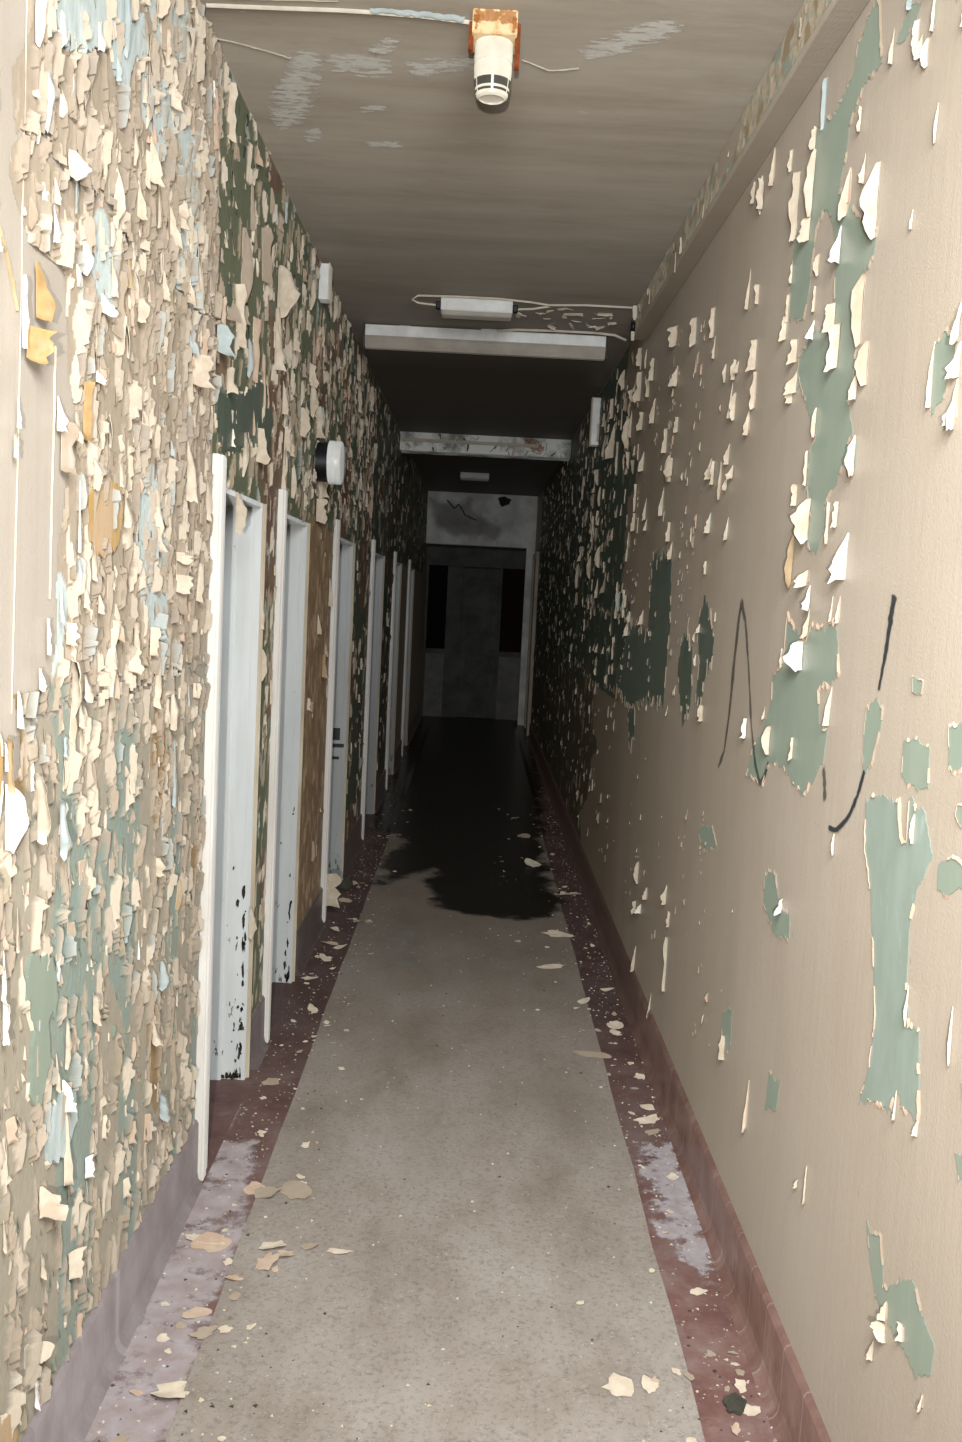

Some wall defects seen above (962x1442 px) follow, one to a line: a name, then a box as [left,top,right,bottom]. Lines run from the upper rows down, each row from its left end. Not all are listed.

peeling [490,0,831,841]
peeling [740,0,937,796]
peeling [925,303,962,431]
peeling [0,0,479,1442]
water stain [369,717,566,920]
peeling [625,850,686,1019]
peeling [692,989,732,1060]
peeling [741,1082,749,1133]
peeling [763,868,790,943]
peeling [859,736,962,1137]
peeling [948,721,962,776]
peeling [866,1220,935,1414]